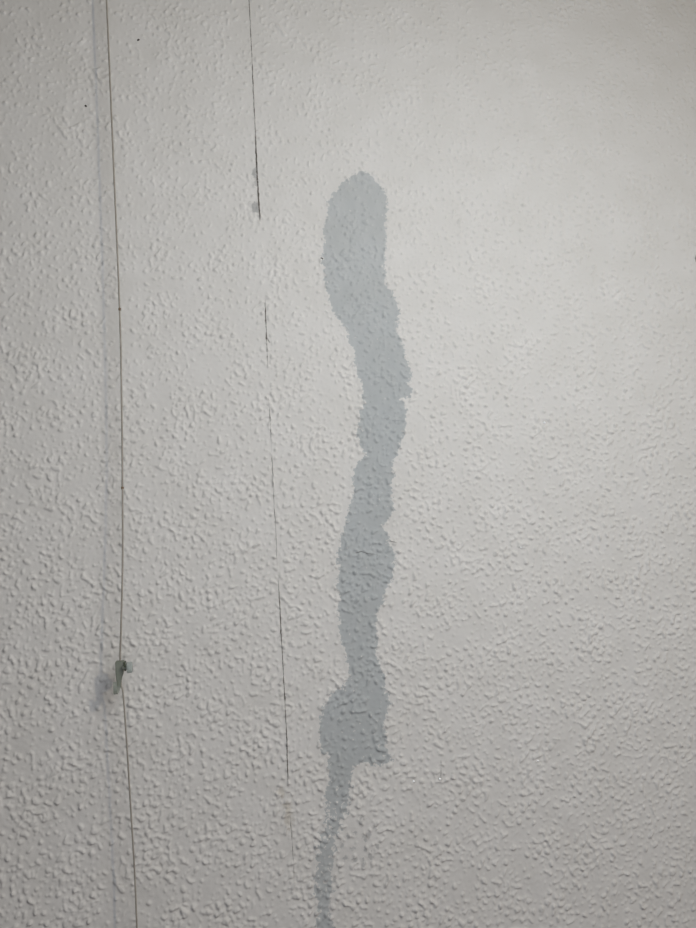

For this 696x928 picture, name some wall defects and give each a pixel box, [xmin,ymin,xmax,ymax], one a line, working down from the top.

crack [249,4,261,217]
damp [310,167,416,928]
crack [279,596,288,775]